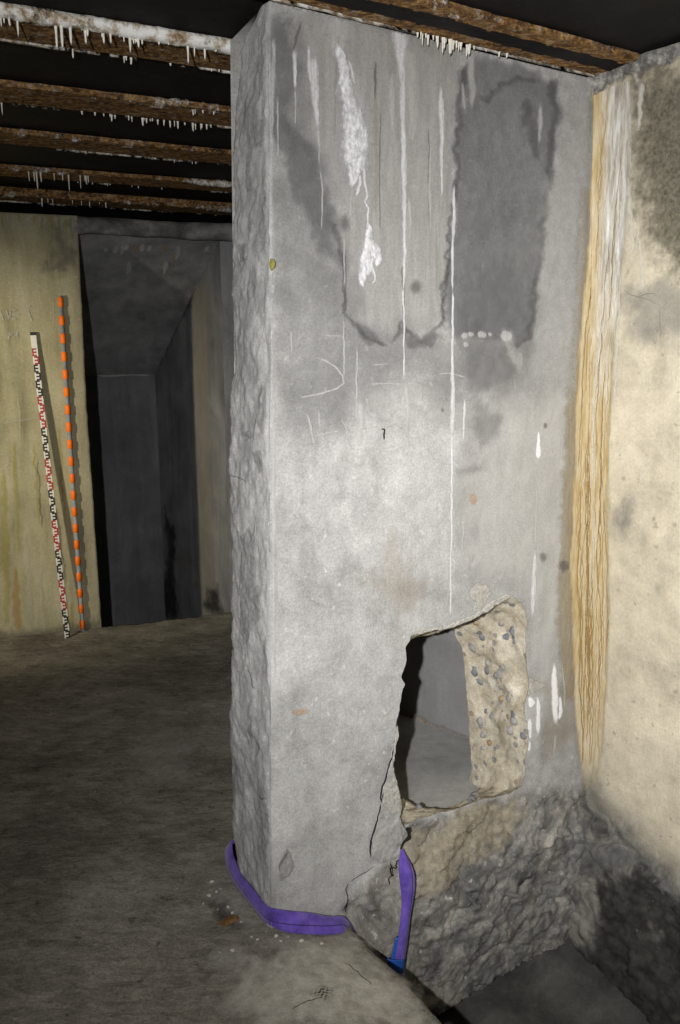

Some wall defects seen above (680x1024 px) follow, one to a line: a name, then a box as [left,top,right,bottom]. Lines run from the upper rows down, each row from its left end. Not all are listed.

water stain [271,0,680,615]
water stain [466,190,587,751]
crack [342,714,411,913]
spalling [372,573,529,894]
spalling [435,937,649,1024]